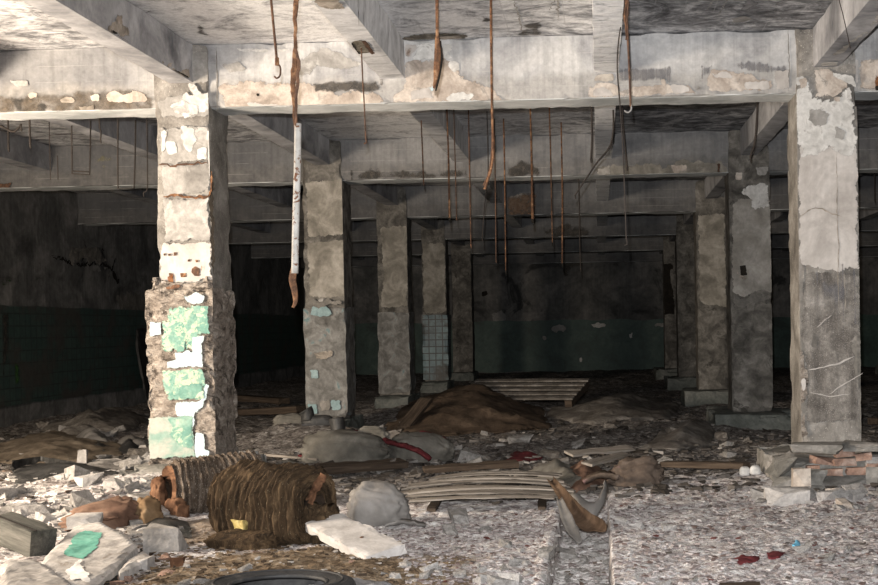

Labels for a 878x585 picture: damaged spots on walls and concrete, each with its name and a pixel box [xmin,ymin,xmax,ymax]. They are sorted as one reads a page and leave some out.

peeling [161,51,210,177]
peeling [218,33,501,107]
peeling [707,15,878,157]
spalling [69,246,146,311]
rust [289,270,298,308]
peeling [149,282,213,459]
crack [810,357,861,397]